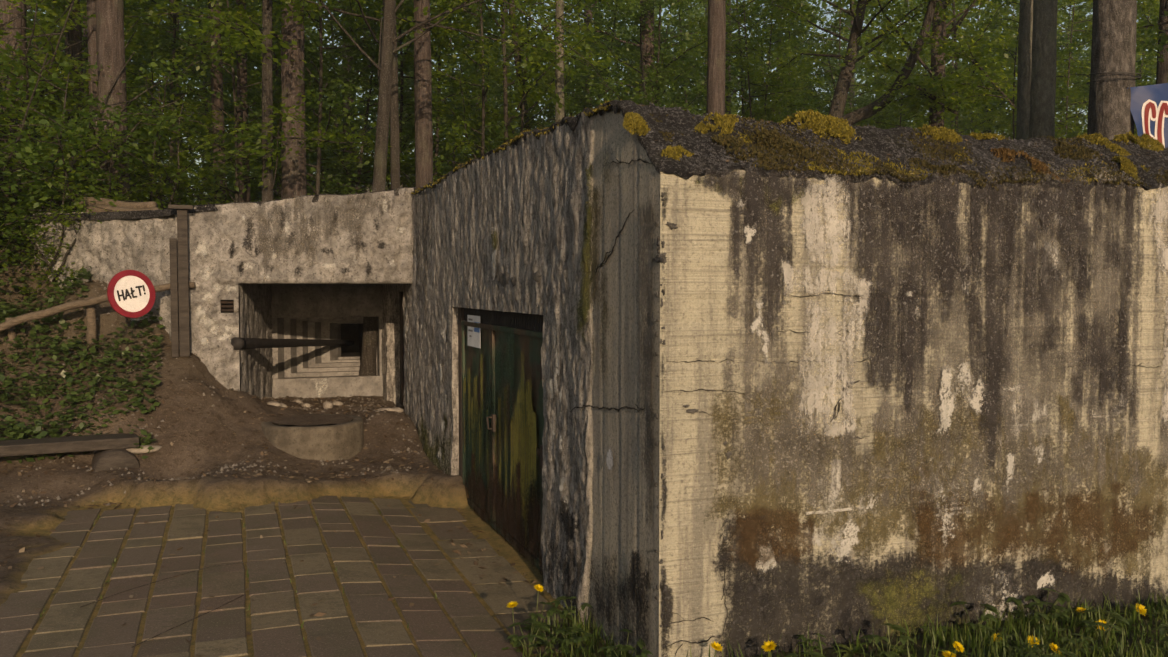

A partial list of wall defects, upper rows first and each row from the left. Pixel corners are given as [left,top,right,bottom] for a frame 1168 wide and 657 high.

crack [586,211,633,283]
crack [569,329,869,439]
crack [789,290,862,298]
damp [696,168,1143,492]
damp [539,500,674,657]
damp [713,459,1166,657]